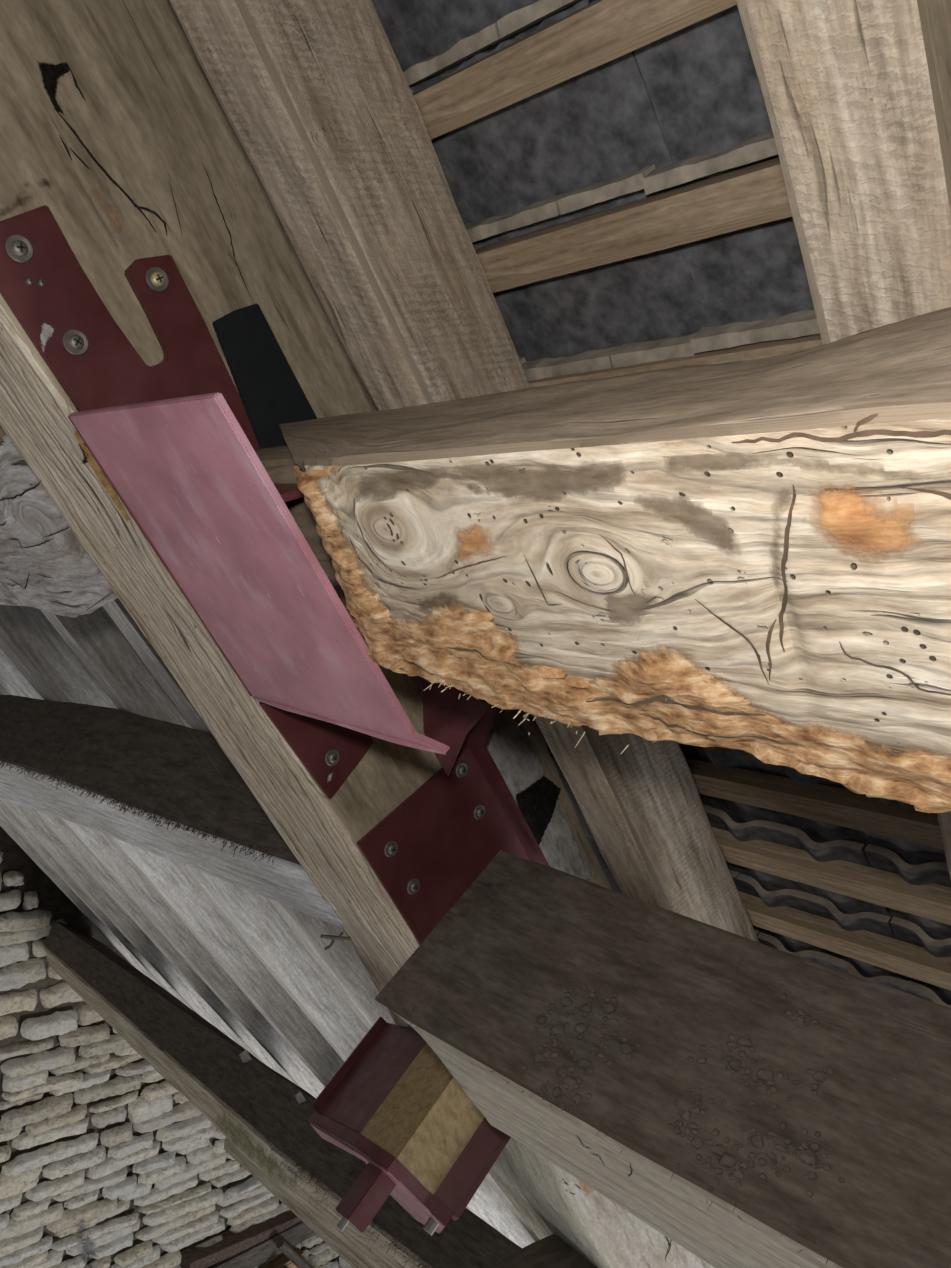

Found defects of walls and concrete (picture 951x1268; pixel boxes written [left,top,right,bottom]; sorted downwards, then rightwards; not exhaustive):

crack [53,69,182,235]
crack [201,162,253,301]
crack [0,408,101,519]
crack [1,527,68,598]
crack [602,485,796,684]
crack [447,647,522,668]
crack [586,696,798,745]
crack [839,641,951,695]